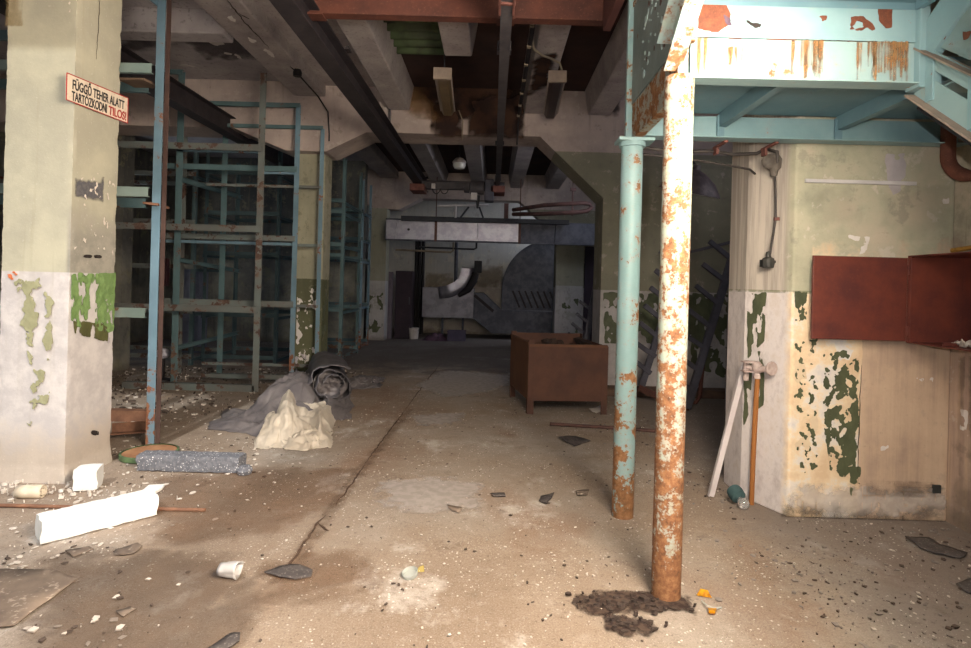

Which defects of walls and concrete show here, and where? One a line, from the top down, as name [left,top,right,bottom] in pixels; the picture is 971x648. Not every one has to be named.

corrosion [697,4,743,76]
corrosion [767,9,909,81]
peeling [14,277,54,409]
peeling [71,272,116,343]
spalling [295,285,327,372]
peeling [743,292,767,425]
peeling [794,291,807,321]
peeling [793,339,861,496]
crack [280,363,441,580]